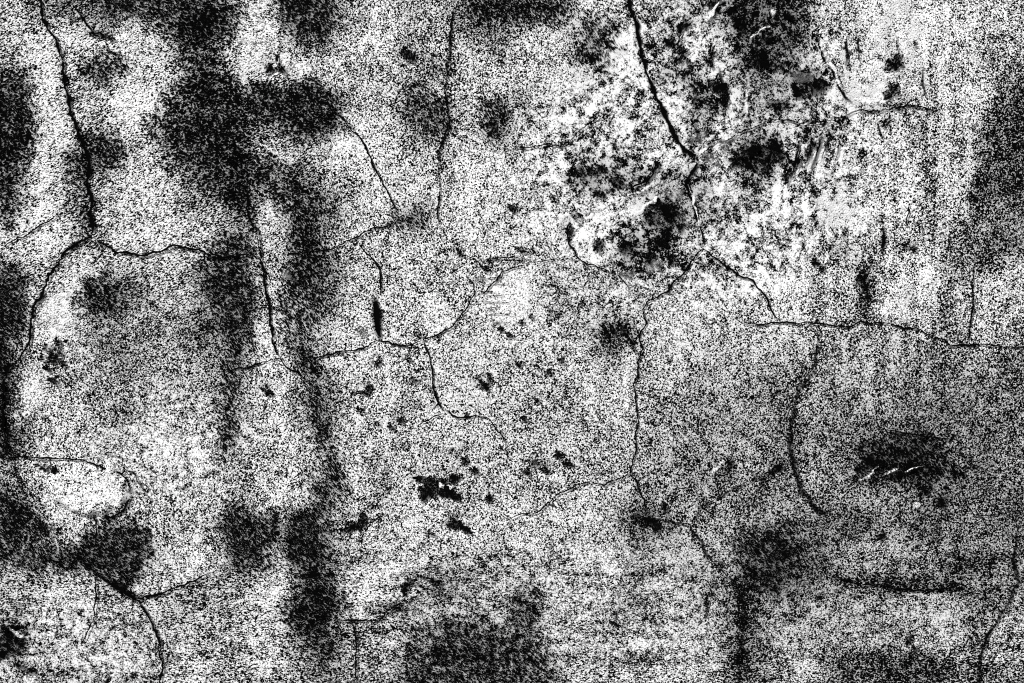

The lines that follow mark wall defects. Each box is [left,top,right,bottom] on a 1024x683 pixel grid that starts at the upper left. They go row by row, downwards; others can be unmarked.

peeling [650,0,860,185]
peeling [858,39,904,138]
water stain [0,261,154,605]
water stain [63,0,354,676]
crack [0,0,629,546]
peeling [564,137,713,296]
crack [508,0,1024,683]
crack [81,573,209,683]
crack [334,595,422,683]
water stain [372,582,569,683]